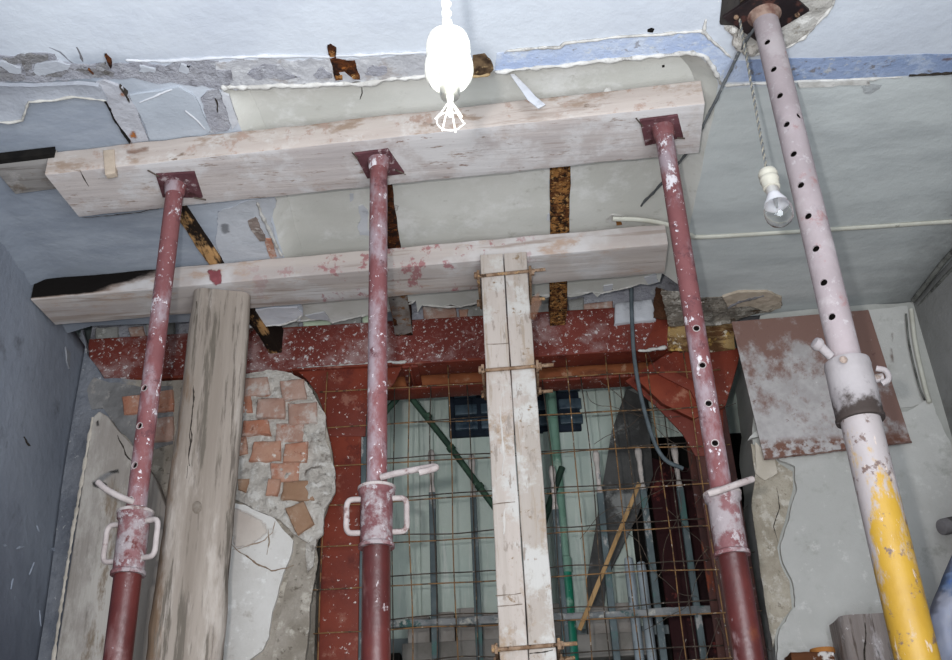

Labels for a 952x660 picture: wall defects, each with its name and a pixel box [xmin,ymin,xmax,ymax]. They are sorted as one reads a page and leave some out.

corrosion [88,53,149,144]
spalling [0,51,426,133]
hole [472,53,494,78]
peeling [510,74,545,109]
spalling [724,25,760,57]
spalling [781,0,836,49]
spalling [282,311,368,328]
spalling [409,300,483,320]
spalling [567,273,689,352]
spalling [701,290,783,352]
flaking render [236,370,336,660]
flaking render [751,442,793,648]